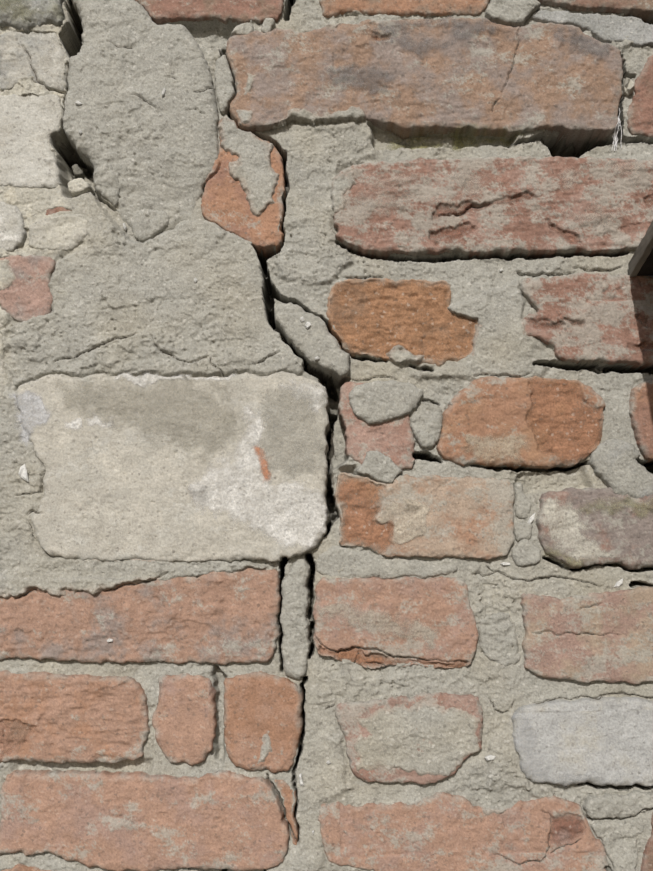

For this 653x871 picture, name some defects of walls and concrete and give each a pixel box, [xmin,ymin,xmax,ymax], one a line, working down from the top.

crack [66,0,83,56]
crack [57,126,100,201]
crack [57,334,224,377]
crack [257,136,397,537]
crack [107,572,168,591]
crack [268,554,460,839]